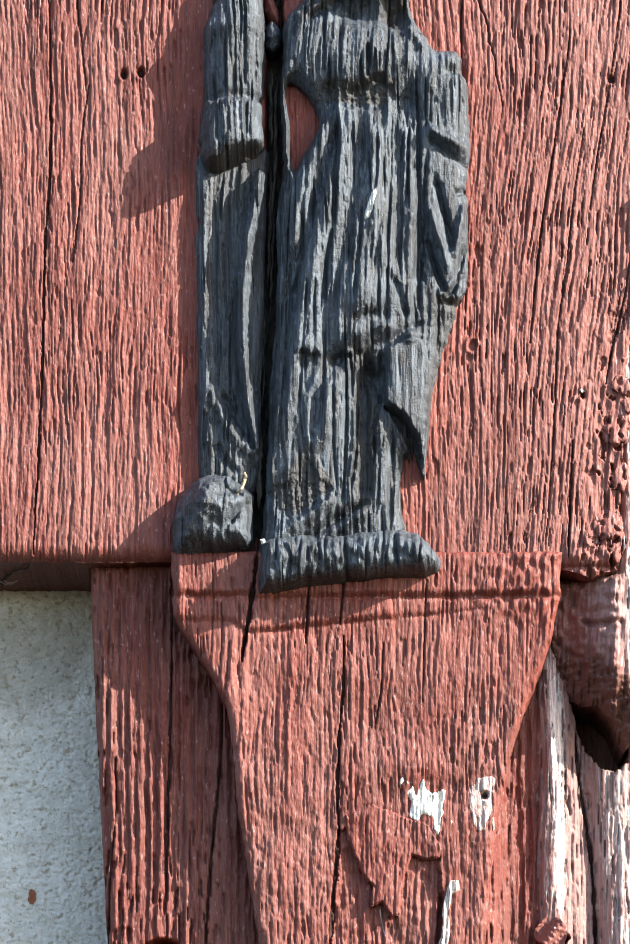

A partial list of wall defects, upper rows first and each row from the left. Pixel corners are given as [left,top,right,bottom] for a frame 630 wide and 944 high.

crack [73,0,103,258]
crack [460,0,502,101]
crack [0,5,52,586]
crack [242,0,282,658]
peeling [611,374,630,414]
peeling [611,457,629,493]
crack [205,712,223,943]
crack [329,584,345,944]
peeling [345,777,453,935]
peeling [438,880,459,944]
peeling [469,776,496,831]